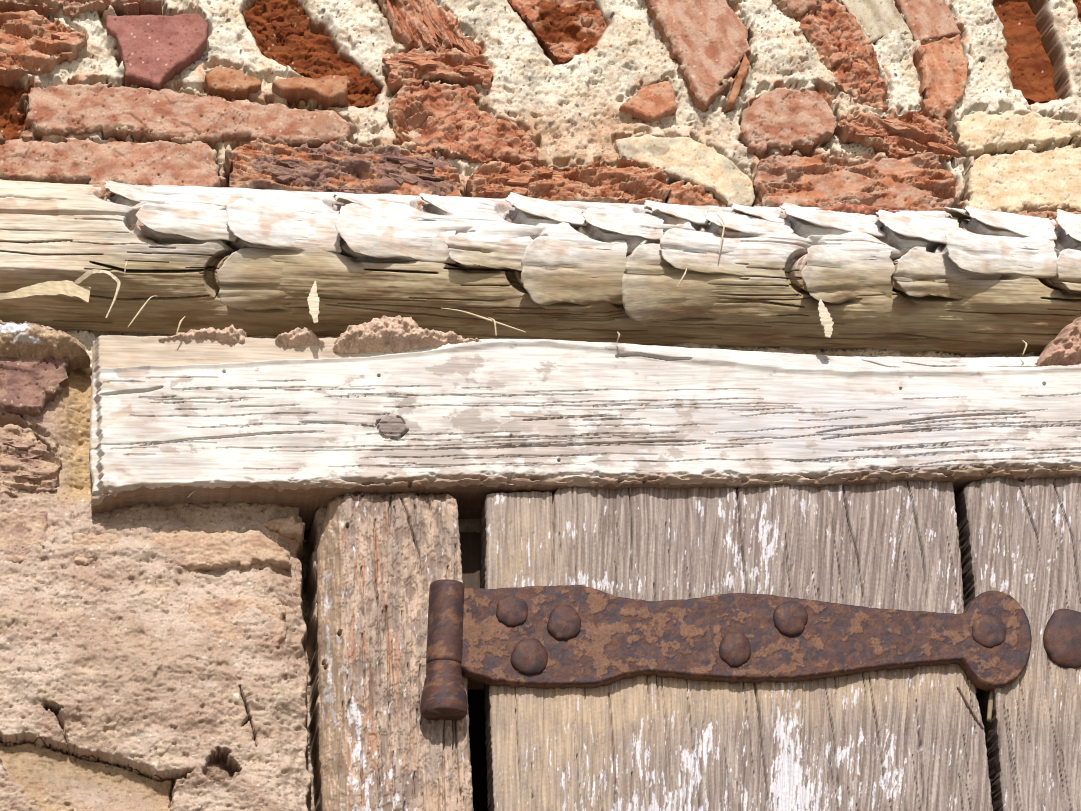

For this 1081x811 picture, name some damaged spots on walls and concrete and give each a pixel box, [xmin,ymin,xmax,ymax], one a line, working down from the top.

crack [0,709,191,806]